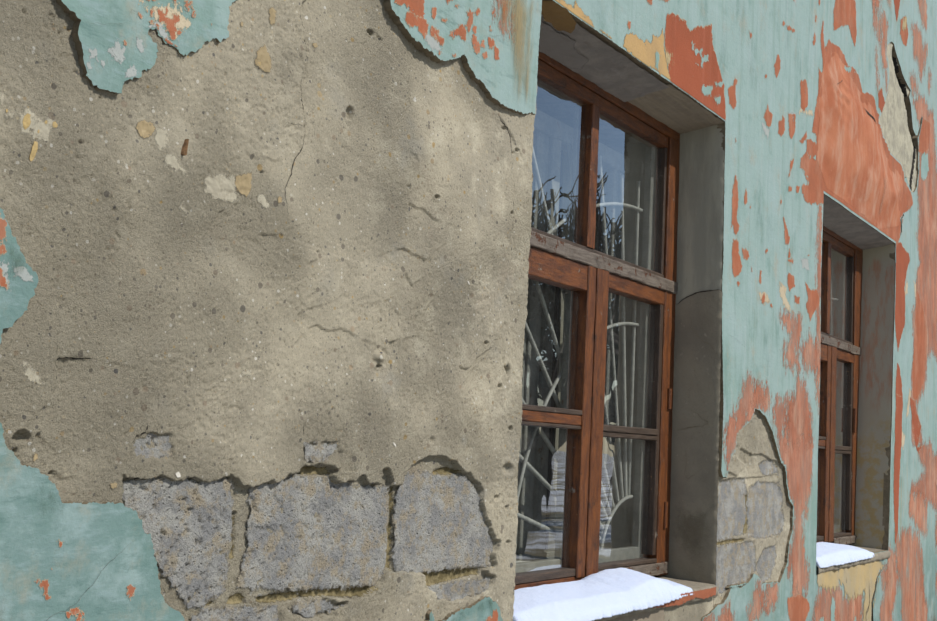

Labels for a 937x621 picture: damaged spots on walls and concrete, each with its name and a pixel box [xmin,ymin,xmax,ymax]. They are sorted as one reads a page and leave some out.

spalling [0,0,537,621]